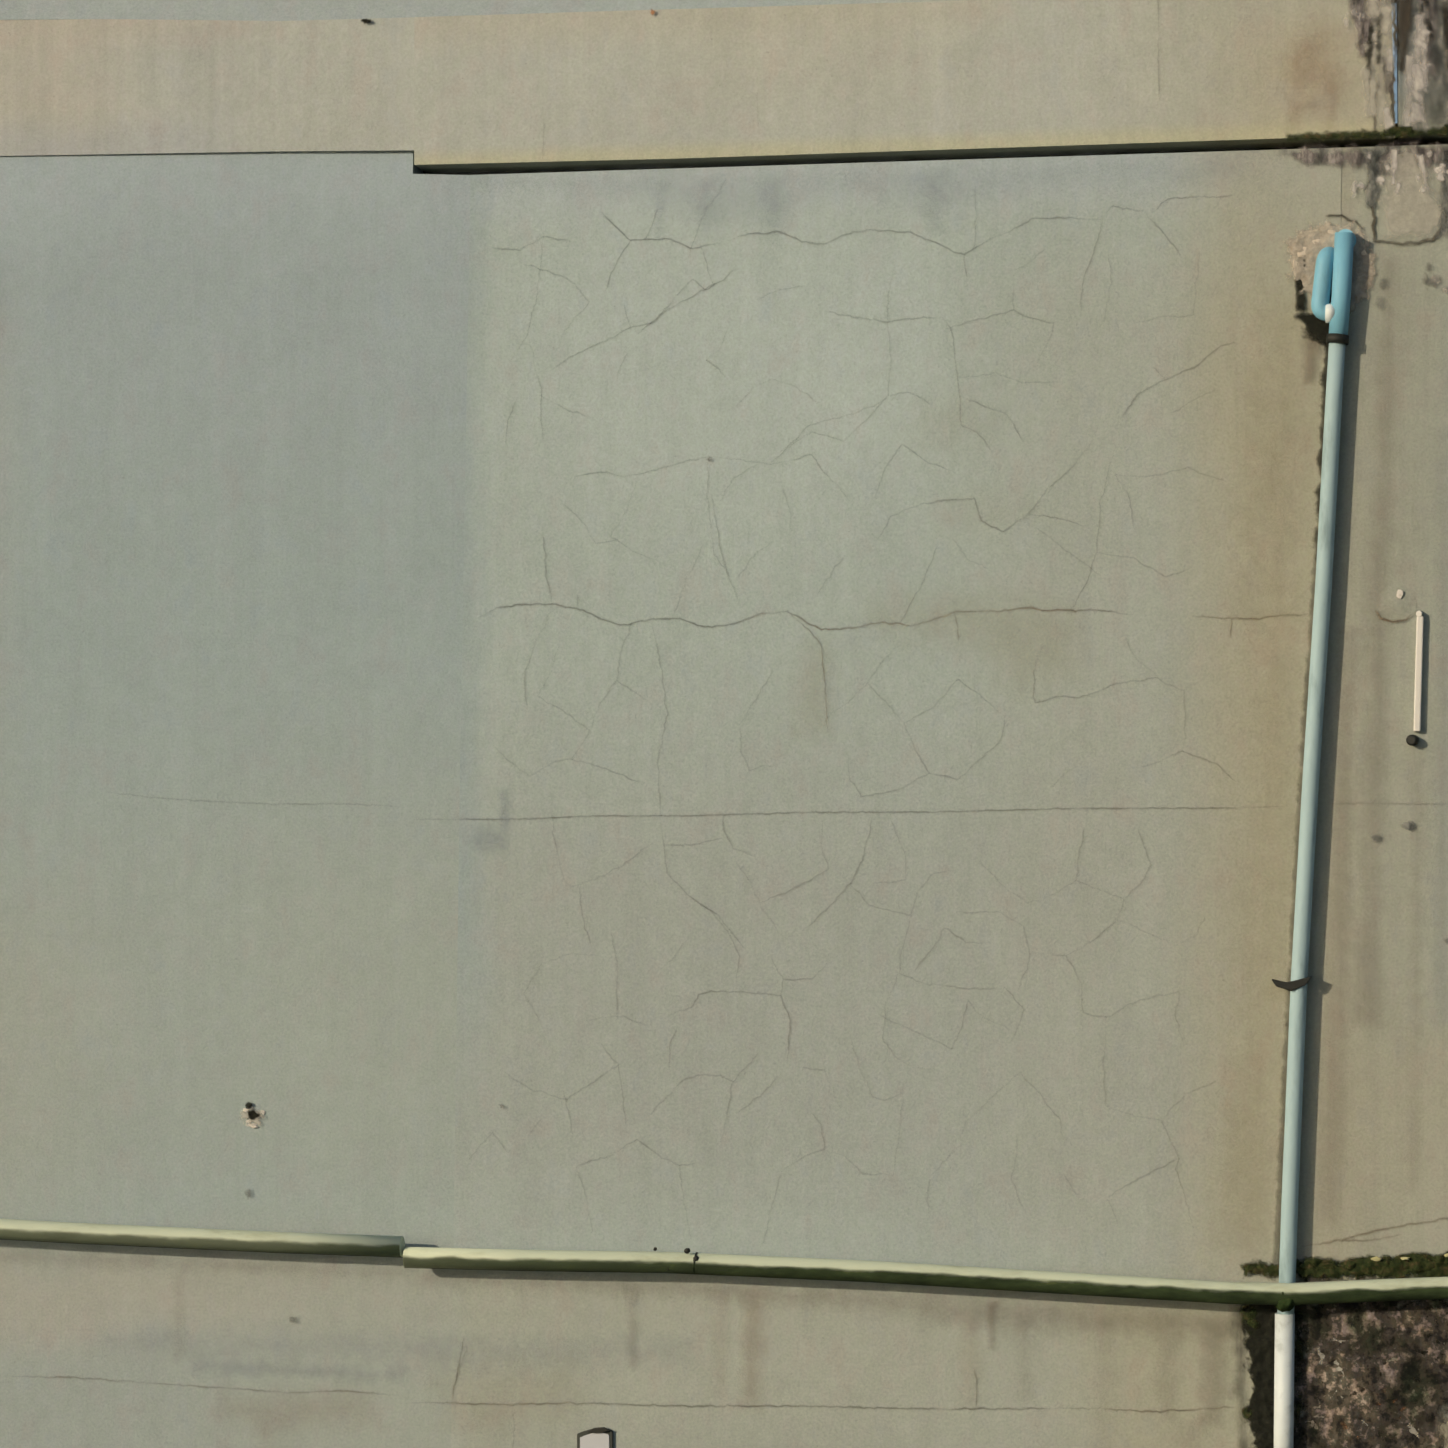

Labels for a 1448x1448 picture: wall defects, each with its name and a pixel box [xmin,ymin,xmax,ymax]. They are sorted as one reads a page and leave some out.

peeling [1364,0,1396,115]
peeling [1417,0,1448,56]
peeling [1352,150,1448,233]
spalling [1286,222,1375,312]
damp [1293,1299,1448,1448]